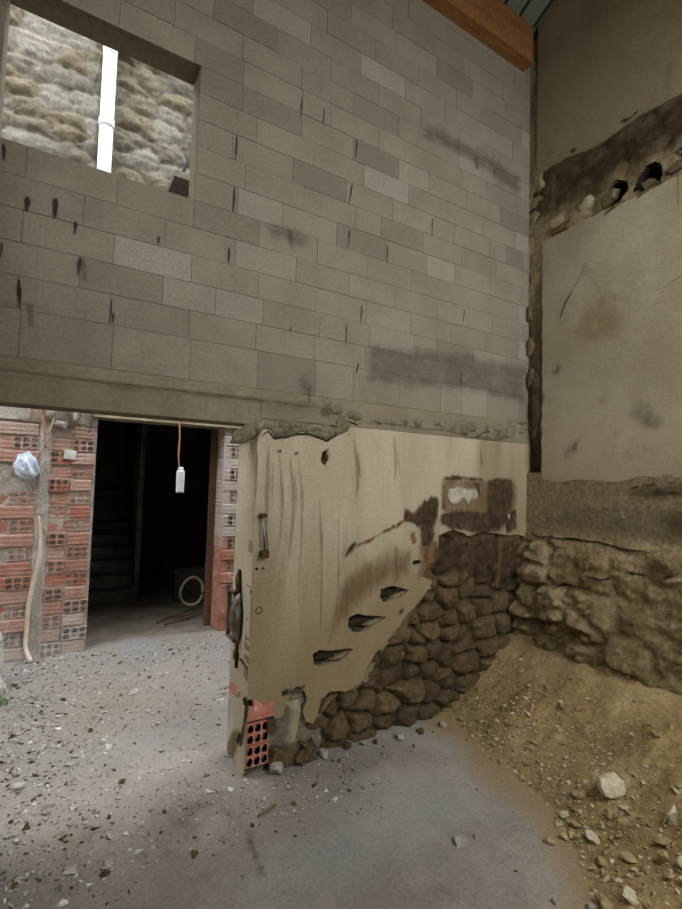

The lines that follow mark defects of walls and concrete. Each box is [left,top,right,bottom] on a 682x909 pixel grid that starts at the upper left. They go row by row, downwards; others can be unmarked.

spalling [526,37,682,473]
spalling [218,530,523,772]